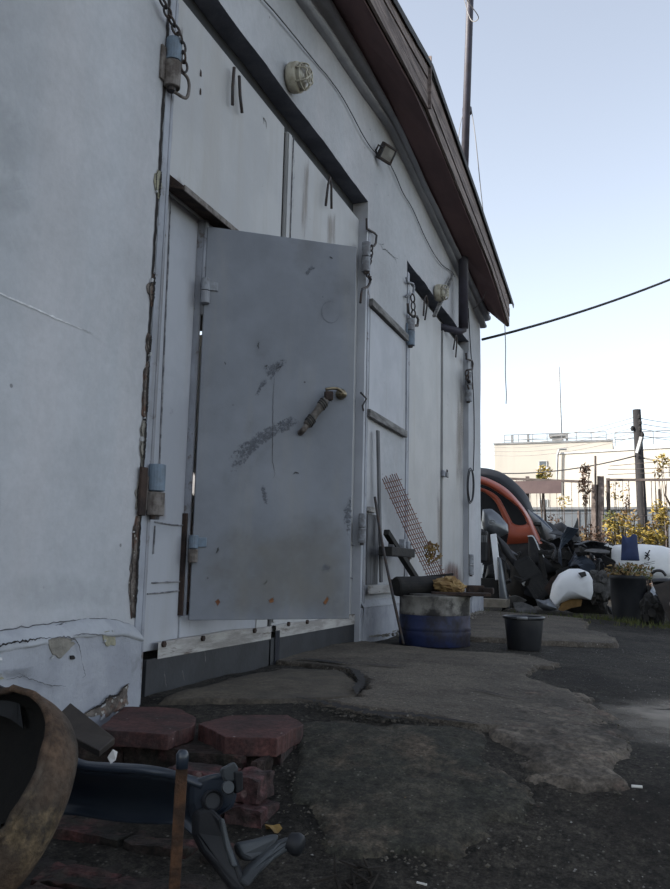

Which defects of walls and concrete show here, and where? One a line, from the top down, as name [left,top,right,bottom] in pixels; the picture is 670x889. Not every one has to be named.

crack [164,0,172,46]
crack [158,82,166,171]
crack [151,193,159,275]
flaking render [147,273,156,307]
crack [145,305,153,363]
flaking render [140,333,152,467]
peeling [233,419,296,466]
flaking render [129,479,142,619]
flaking render [48,637,76,659]
crack [0,618,129,678]
flaking render [84,684,129,720]